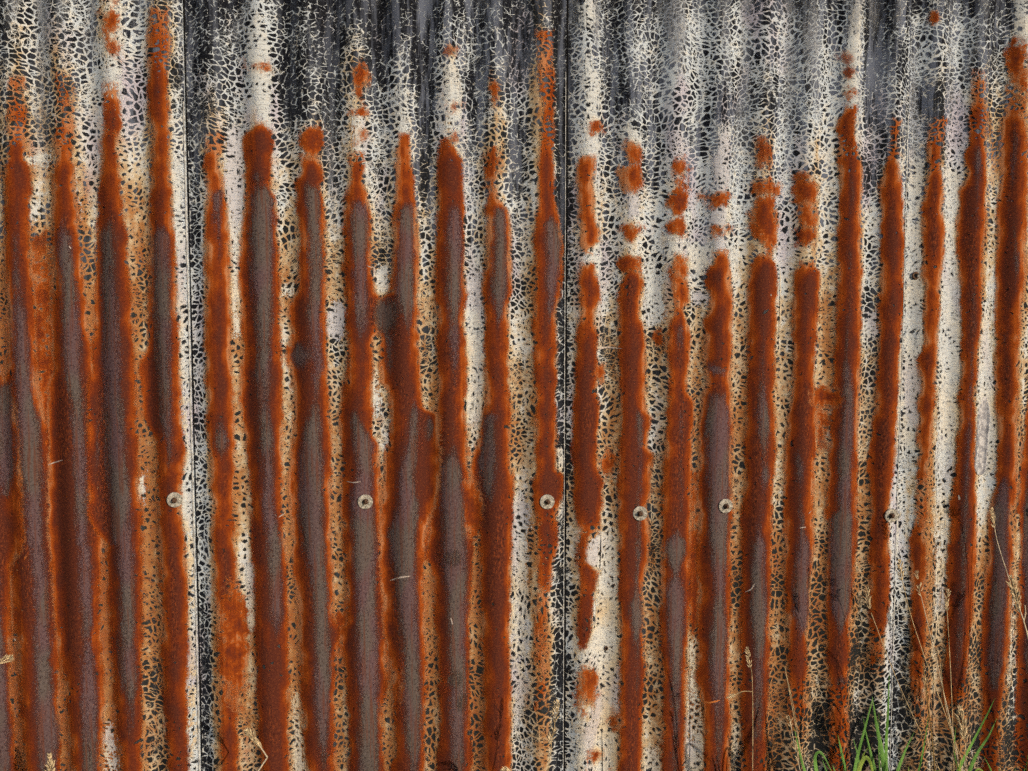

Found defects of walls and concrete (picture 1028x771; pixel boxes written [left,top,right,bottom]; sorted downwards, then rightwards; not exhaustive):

corrosion [347,63,372,116]
corrosion [488,80,500,105]
corrosion [0,0,189,771]
crack [223,401,263,612]
crack [276,477,307,771]
corrosion [202,123,515,771]
crack [364,316,409,512]
crack [378,559,448,771]
crack [462,528,495,771]
crack [462,351,498,479]
corrosion [531,30,906,771]
corrosion [908,36,1028,771]